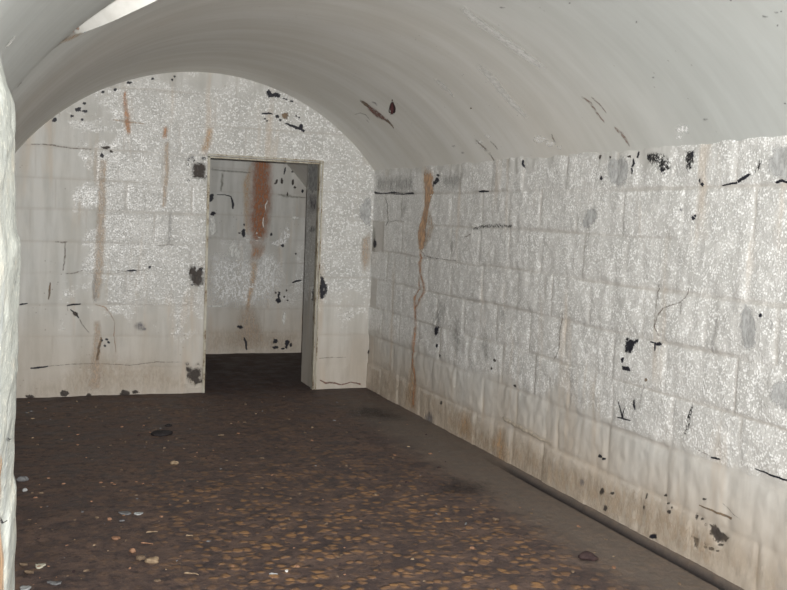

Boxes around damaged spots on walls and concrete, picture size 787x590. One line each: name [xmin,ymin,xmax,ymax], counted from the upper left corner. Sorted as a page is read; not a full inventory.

rust [361,101,394,128]
peeling [187,156,207,181]
peeling [599,151,670,186]
rust [252,161,270,239]
rust [414,174,433,318]
peeling [189,267,204,286]
peeling [621,338,639,371]
peeling [186,363,202,384]
spalling [694,513,729,552]